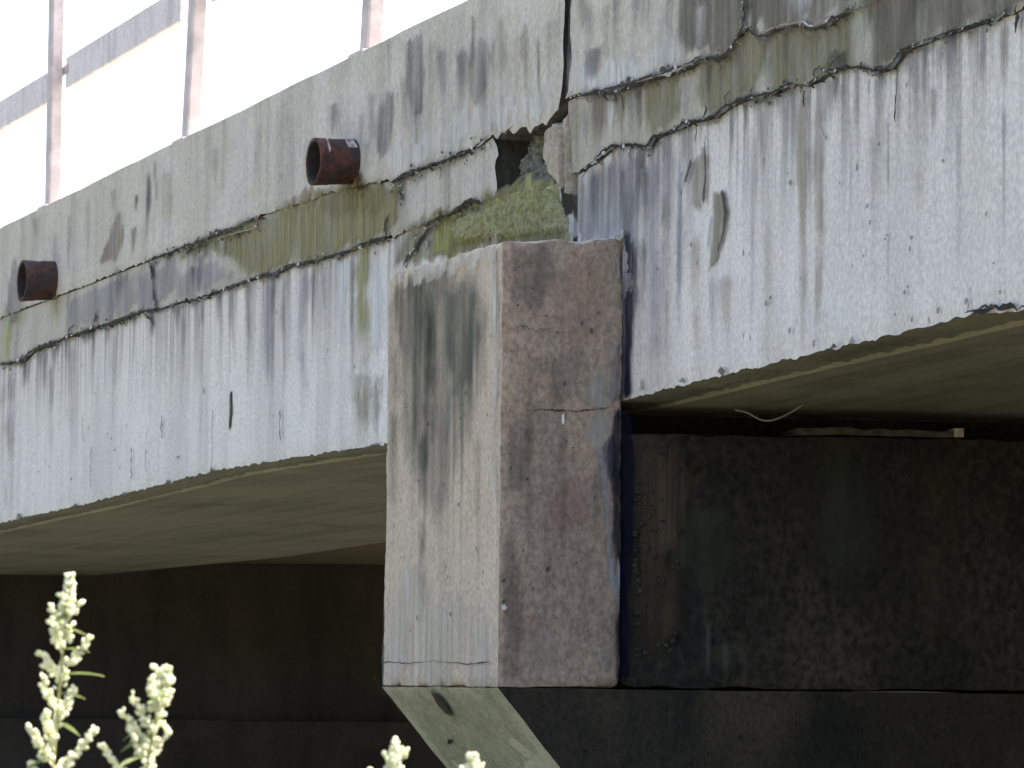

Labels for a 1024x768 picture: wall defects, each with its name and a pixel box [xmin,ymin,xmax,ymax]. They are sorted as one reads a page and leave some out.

crack [569,0,1020,178]
peeling [518,122,572,215]
crack [0,136,489,370]
damp [337,254,352,324]
crack [534,405,621,420]